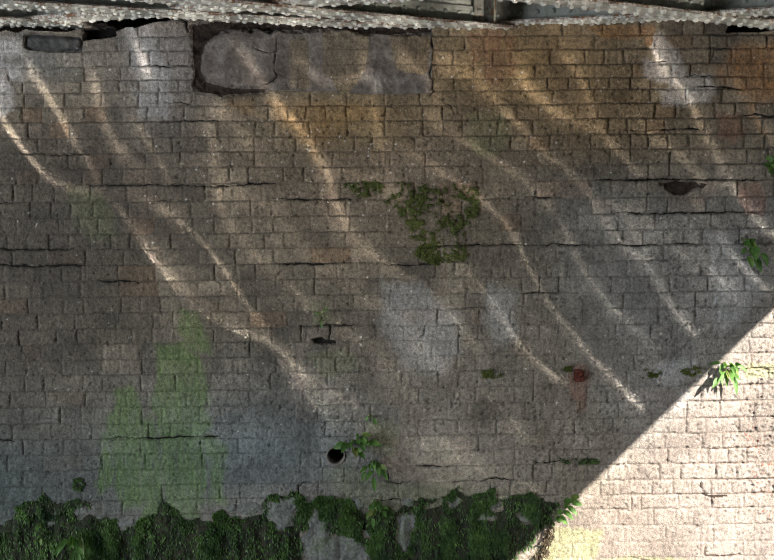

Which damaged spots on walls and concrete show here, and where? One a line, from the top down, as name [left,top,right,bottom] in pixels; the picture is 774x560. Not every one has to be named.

crack [689,74,746,90]
crack [632,125,699,133]
crack [600,176,758,184]
spalling [658,181,706,195]
crack [0,248,86,268]
crack [275,260,337,268]
crack [385,243,690,266]
crack [102,278,148,286]
corrosion [565,361,593,416]
crack [117,433,218,441]
leakage [89,380,167,520]
leakage [202,430,233,512]